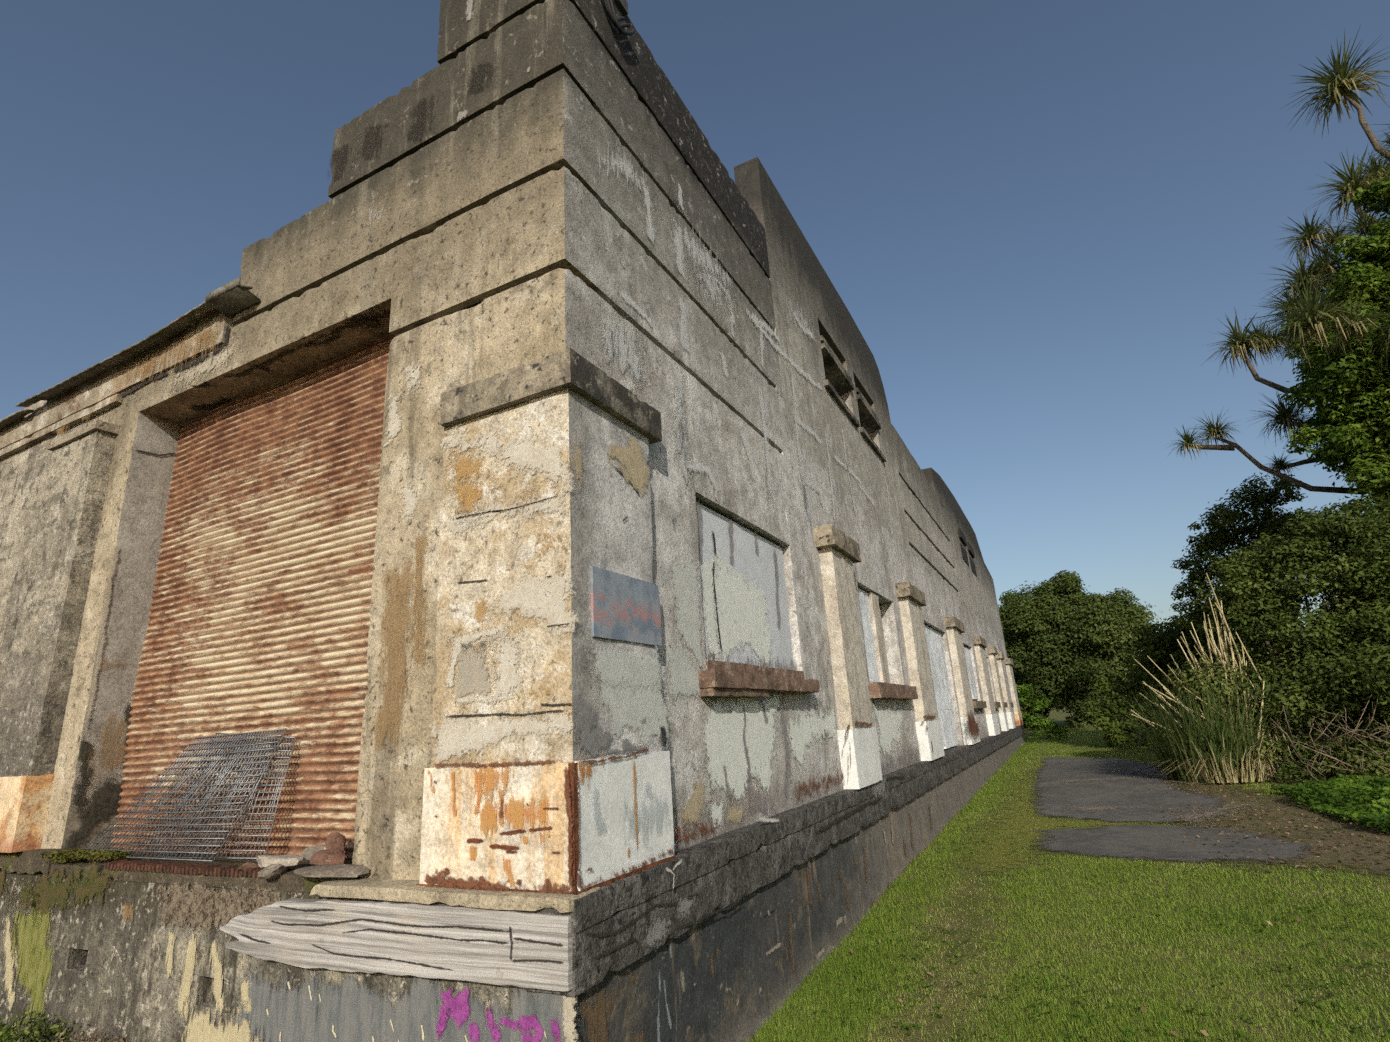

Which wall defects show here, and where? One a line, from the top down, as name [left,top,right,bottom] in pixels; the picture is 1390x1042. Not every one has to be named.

peeling [383,360,423,447]
peeling [396,480,419,521]
peeling [440,425,583,538]
spalling [608,437,650,496]
peeling [429,551,836,827]
corrosion [795,721,872,802]
corrosion [416,748,718,895]
damp [643,859,696,948]